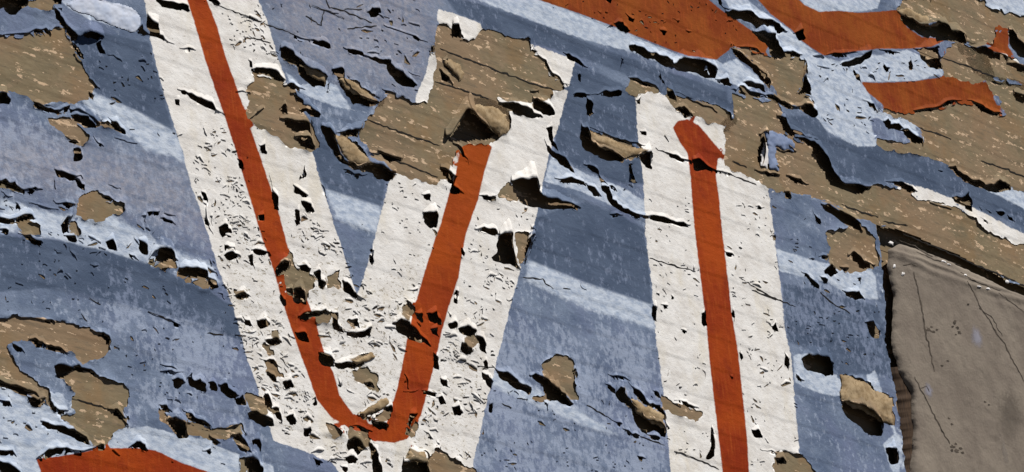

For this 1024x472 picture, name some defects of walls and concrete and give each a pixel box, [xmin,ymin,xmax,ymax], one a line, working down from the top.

peeling [0,0,180,159]
peeling [222,0,1024,299]
peeling [0,125,581,472]
peeling [601,352,708,458]
peeling [653,261,707,341]
peeling [841,396,899,463]
crack [900,240,1024,444]